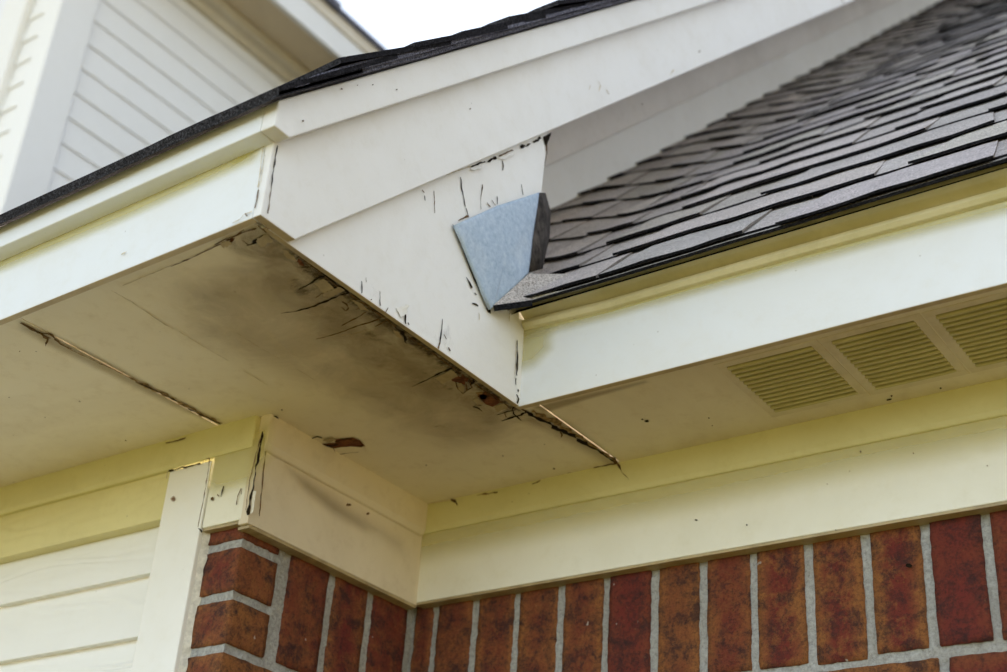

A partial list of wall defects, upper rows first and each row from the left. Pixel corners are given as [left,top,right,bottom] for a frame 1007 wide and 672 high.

crack [20,323,222,424]
crack [113,133,617,464]
leakage [298,256,519,410]
crack [246,416,278,516]